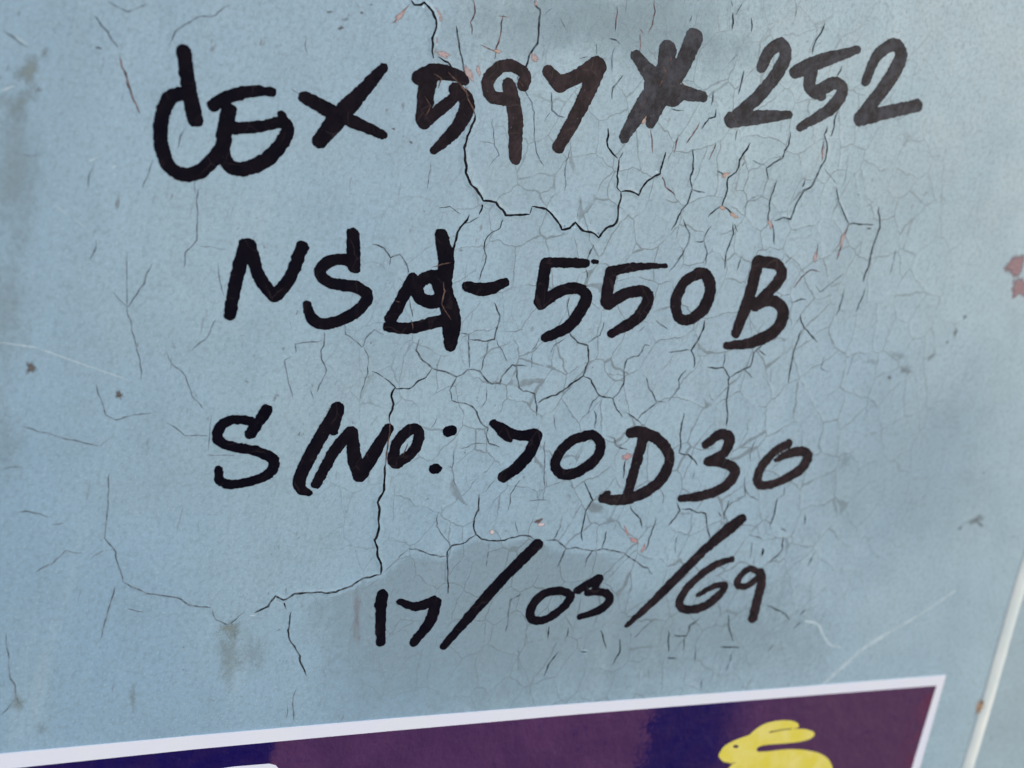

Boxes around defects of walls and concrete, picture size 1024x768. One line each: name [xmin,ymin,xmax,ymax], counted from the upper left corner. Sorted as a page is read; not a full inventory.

crack [38,0,896,720]
peeling [1005,255,1024,298]